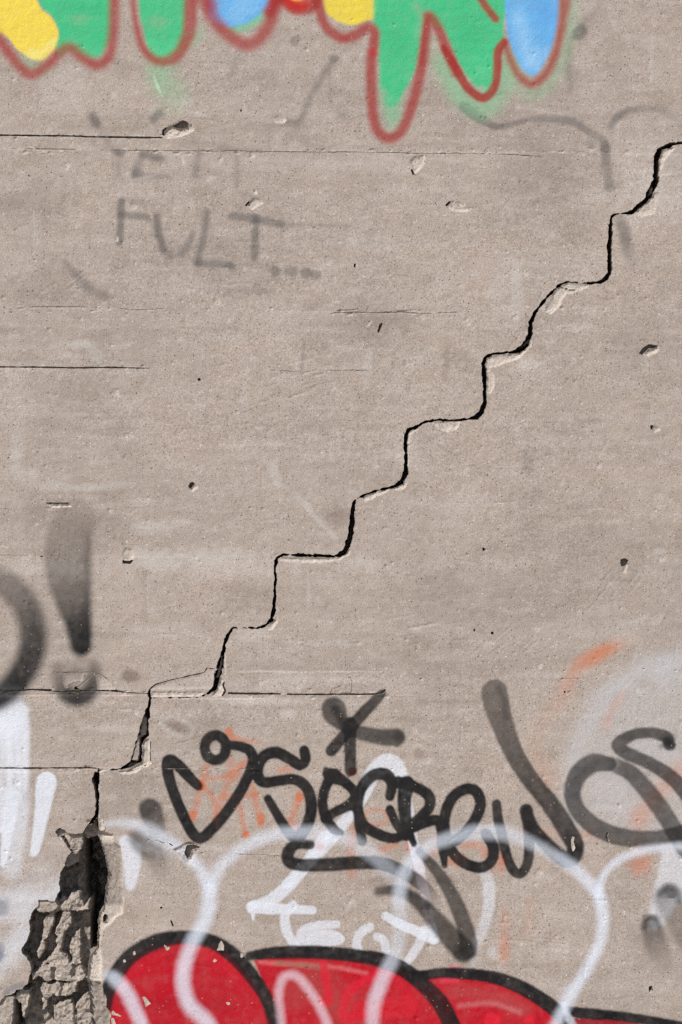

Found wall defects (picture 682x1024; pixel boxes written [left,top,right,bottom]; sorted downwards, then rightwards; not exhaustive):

crack [0,134,542,157]
crack [0,141,682,831]
spalling [0,818,125,1024]